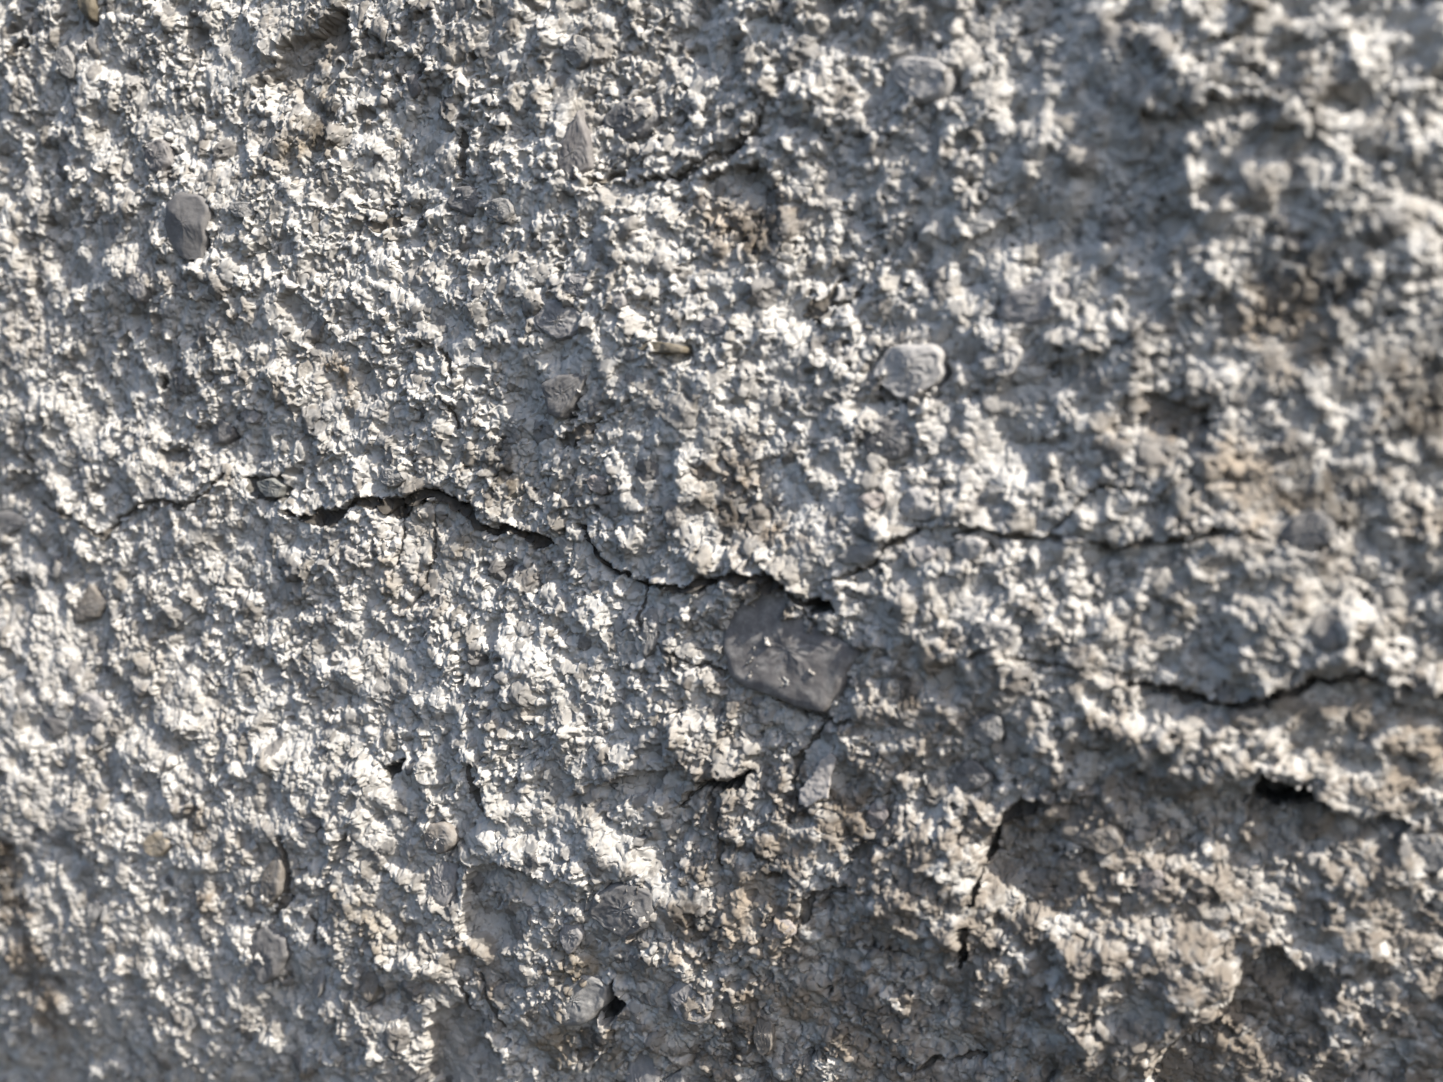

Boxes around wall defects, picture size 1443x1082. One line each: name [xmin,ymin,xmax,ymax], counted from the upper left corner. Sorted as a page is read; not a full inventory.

crack [22,431,36,463]
crack [40,475,223,540]
crack [4,577,31,589]
crack [283,484,1267,676]
crack [1128,673,1377,710]
crack [956,799,1041,970]